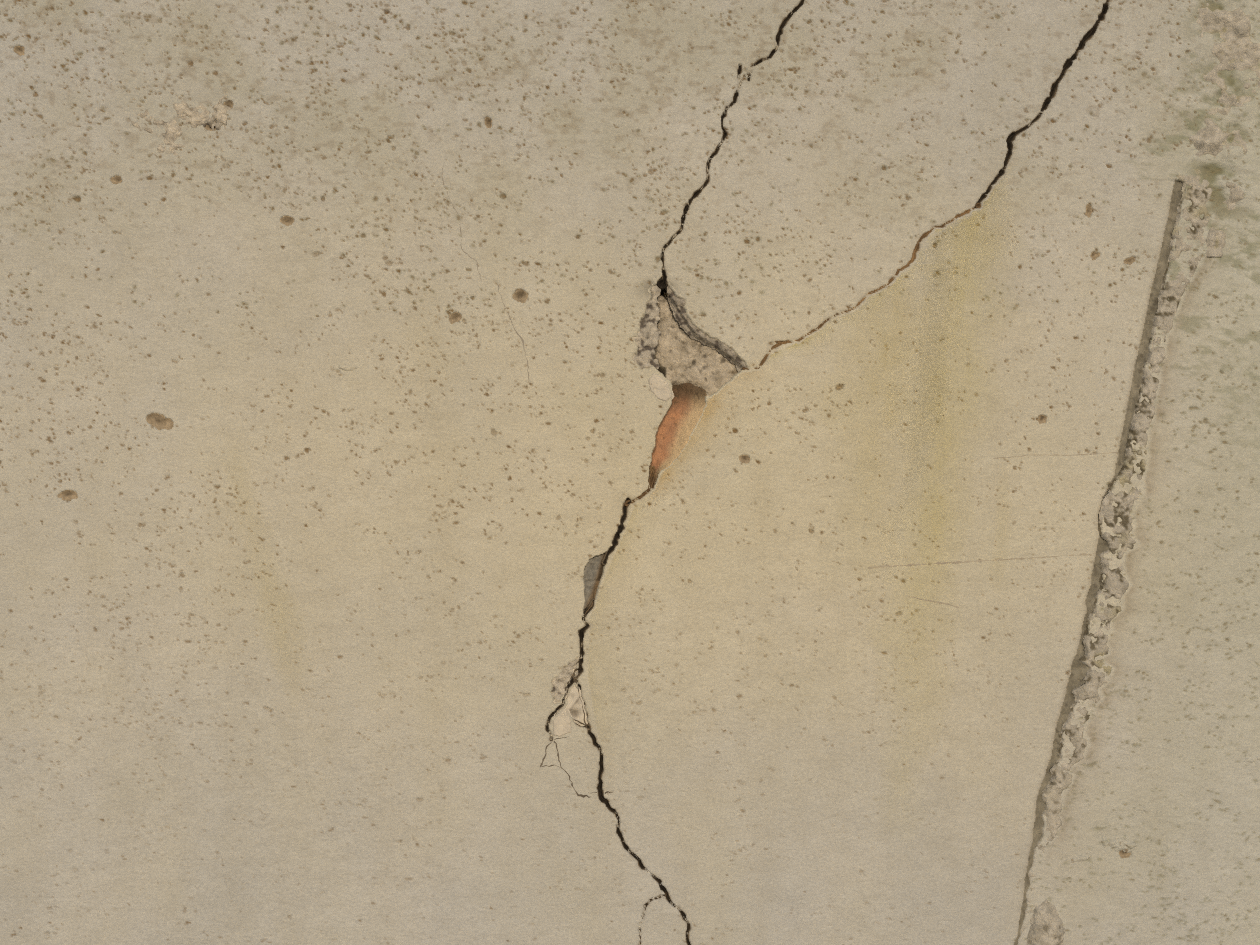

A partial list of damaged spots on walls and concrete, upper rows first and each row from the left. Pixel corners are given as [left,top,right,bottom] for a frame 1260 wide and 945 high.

crack [657,0,804,290]
crack [742,0,1110,370]
crack [601,465,655,565]
spalling [632,285,747,488]
crack [540,598,691,945]